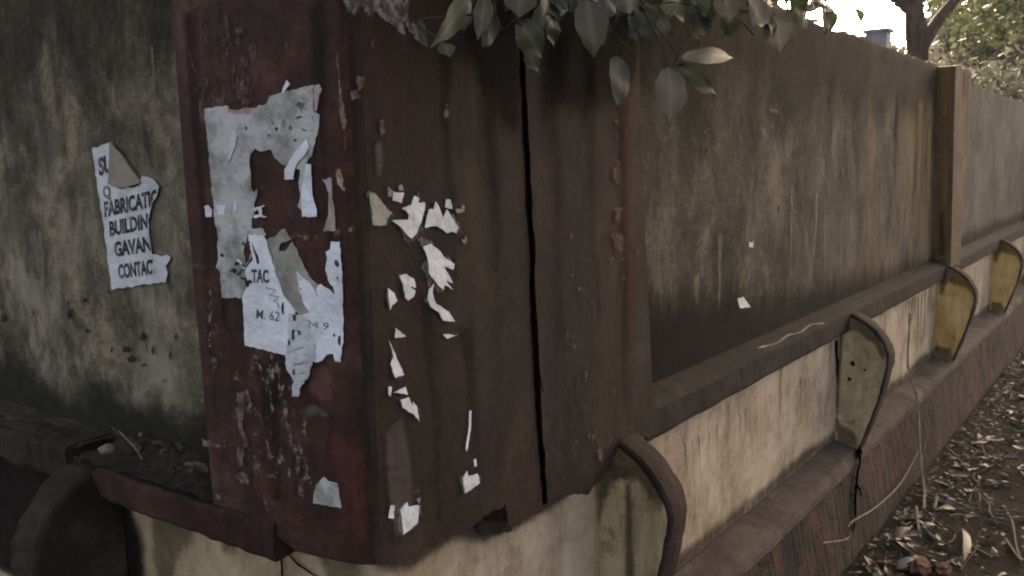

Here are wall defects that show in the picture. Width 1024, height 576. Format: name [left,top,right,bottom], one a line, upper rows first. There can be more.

crack [519,61,548,505]
crack [852,448,863,531]